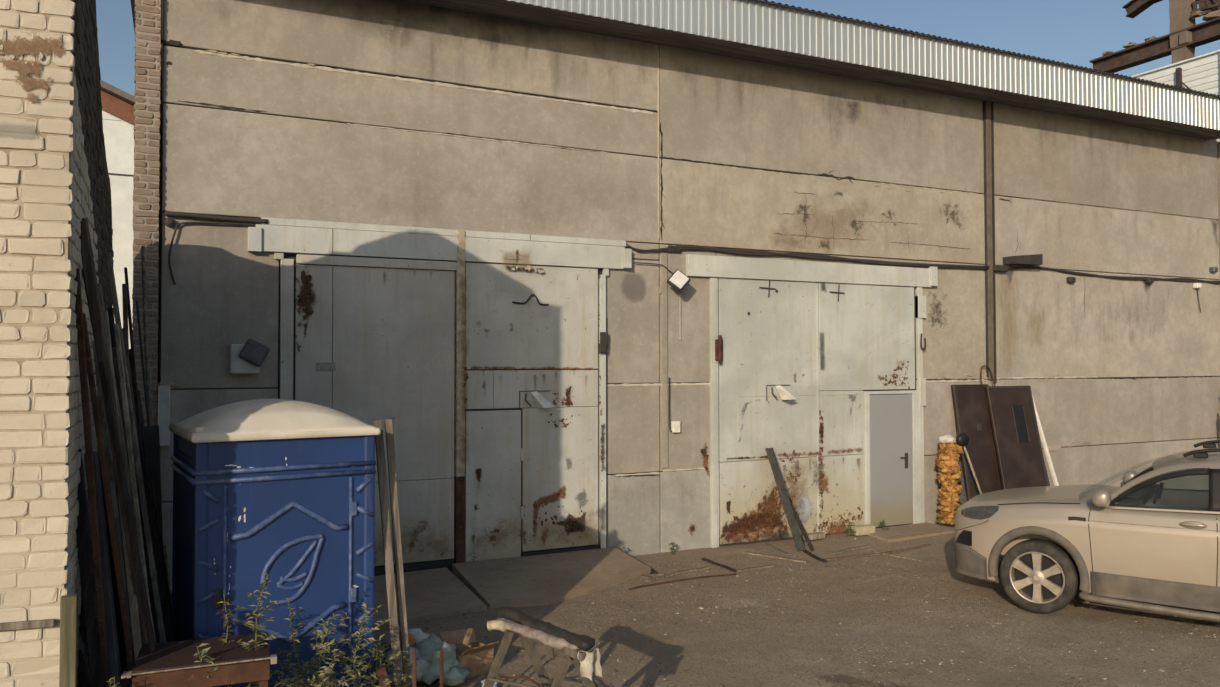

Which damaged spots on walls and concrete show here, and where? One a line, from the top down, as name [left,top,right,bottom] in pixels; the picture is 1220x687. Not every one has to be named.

crack [659,123,969,254]
rust [294,263,315,352]
rust [463,366,603,472]
rust [878,361,910,389]
rust [520,487,586,543]
rust [720,410,863,543]